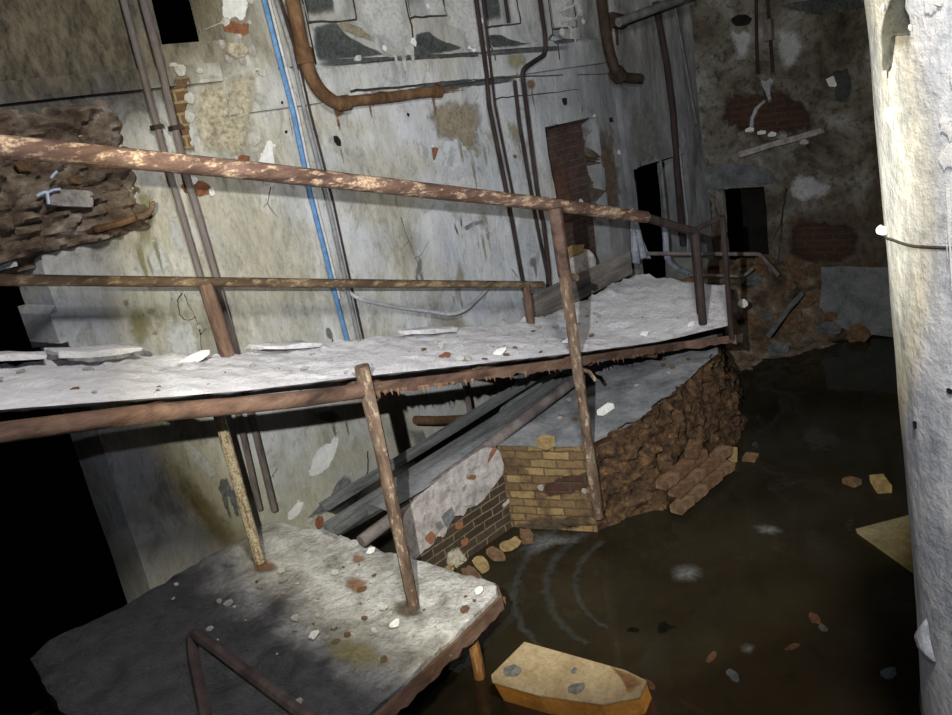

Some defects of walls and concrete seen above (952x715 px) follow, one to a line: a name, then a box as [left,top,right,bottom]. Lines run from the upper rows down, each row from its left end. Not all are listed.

peeling [206,0,254,39]
spalling [0,100,128,148]
peeling [169,62,276,164]
spalling [723,88,825,134]
peeling [551,133,621,207]
spalling [0,158,169,276]
peeling [170,214,188,259]
spalling [792,217,857,267]
peeling [403,446,504,559]